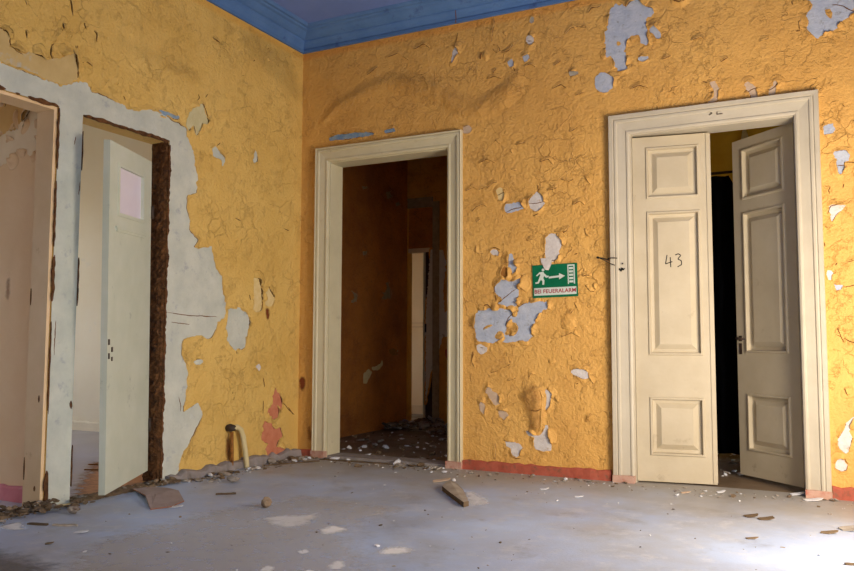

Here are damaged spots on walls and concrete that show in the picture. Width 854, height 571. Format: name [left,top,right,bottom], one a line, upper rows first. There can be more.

peeling [595,0,662,96]
peeling [800,0,854,41]
flaking render [0,24,276,507]
peeling [470,247,553,357]
spalling [255,360,293,455]
peeling [504,381,557,459]
peeling [831,417,854,475]